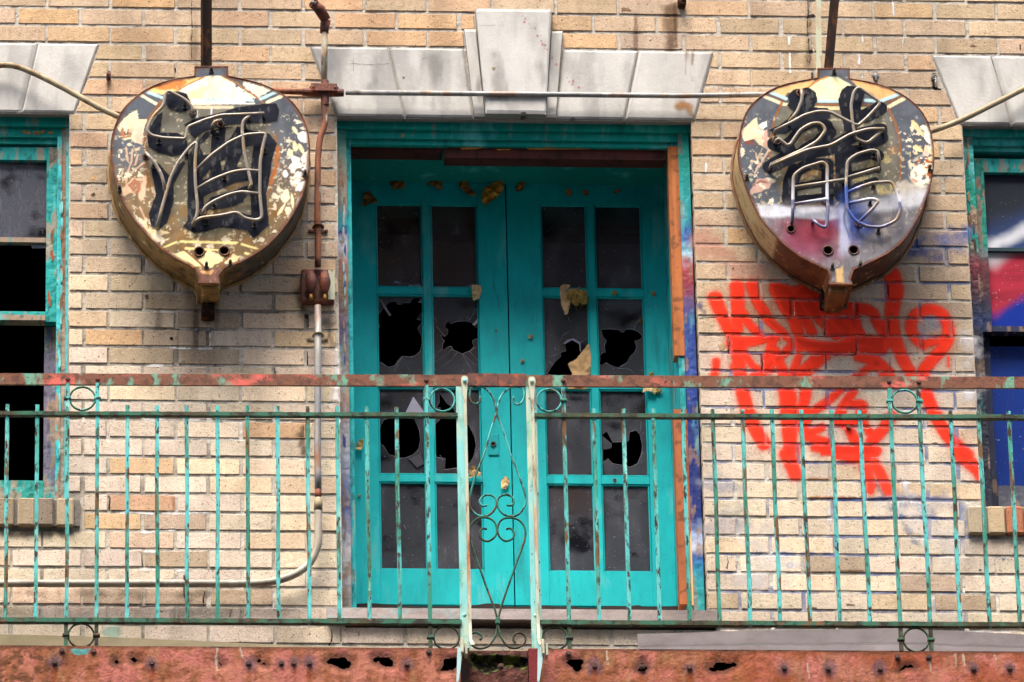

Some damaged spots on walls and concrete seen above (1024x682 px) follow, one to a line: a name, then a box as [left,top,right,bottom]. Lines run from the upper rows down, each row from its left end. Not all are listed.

hole [327,657,351,669]
hole [373,658,393,667]
hole [440,658,457,671]
hole [566,659,584,672]
hole [709,662,737,672]